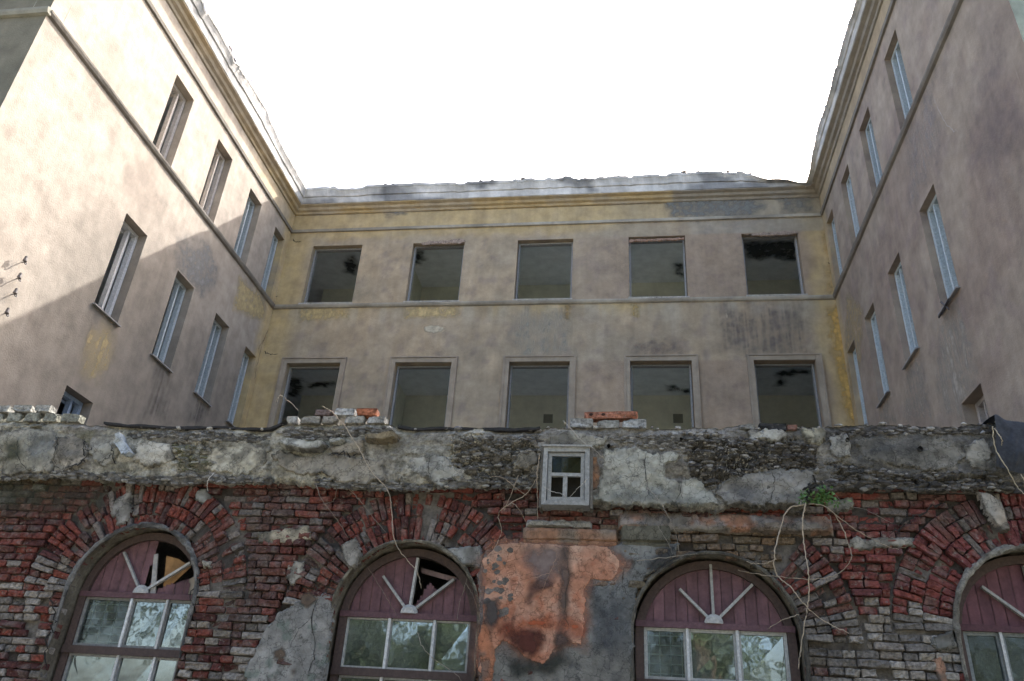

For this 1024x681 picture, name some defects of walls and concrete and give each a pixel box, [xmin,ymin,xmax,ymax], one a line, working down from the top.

flaking render [0,424,1024,509]
crack [291,598,318,678]
flaking render [447,541,680,681]